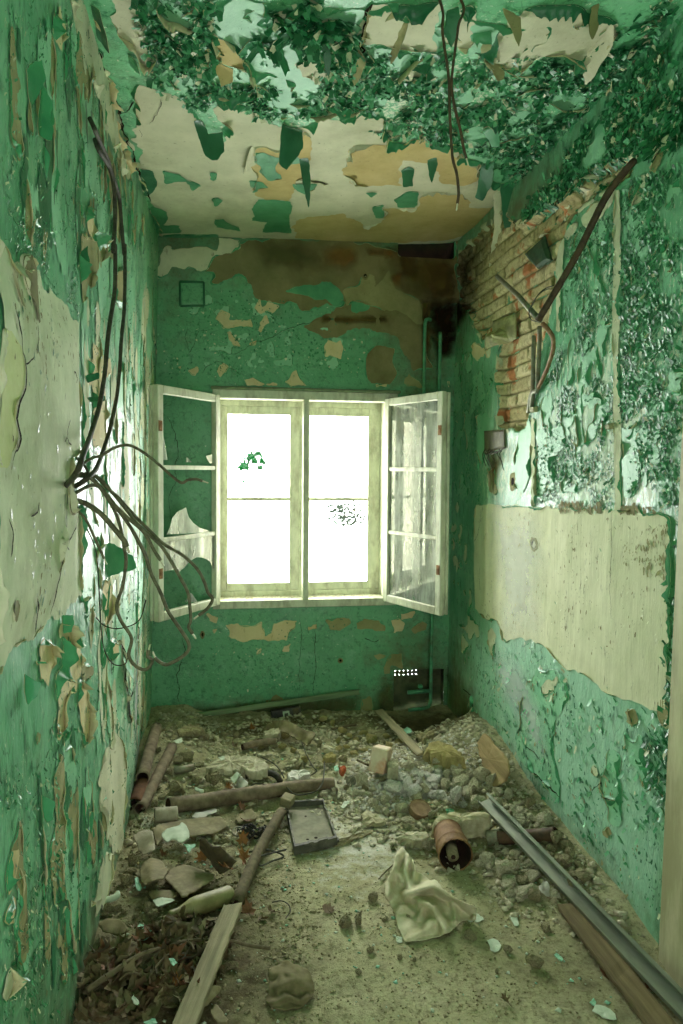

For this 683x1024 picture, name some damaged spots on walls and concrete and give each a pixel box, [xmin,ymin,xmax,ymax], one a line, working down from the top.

water stain [396,252,454,357]
peeling [0,328,63,468]
spalling [13,524,59,629]
peeling [206,611,427,694]
peeling [451,523,678,920]